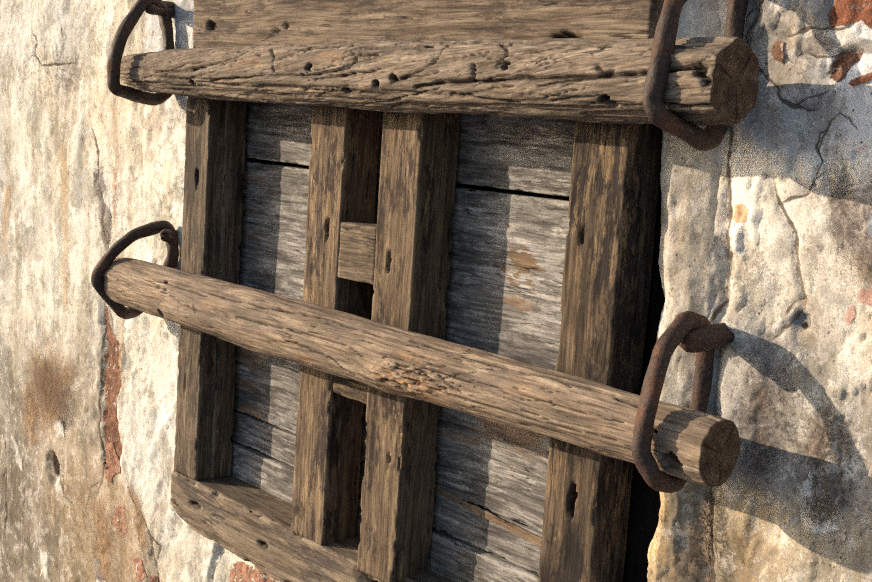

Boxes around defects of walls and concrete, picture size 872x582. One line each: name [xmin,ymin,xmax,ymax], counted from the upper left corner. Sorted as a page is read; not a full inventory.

crack [18,29,76,71]
crack [745,0,763,45]
spalling [771,40,784,63]
crack [787,26,849,58]
spalling [796,36,872,86]
spalling [828,0,872,29]
crack [759,68,858,344]
peeling [102,306,167,519]
spalling [133,558,158,582]
spalling [229,556,280,582]